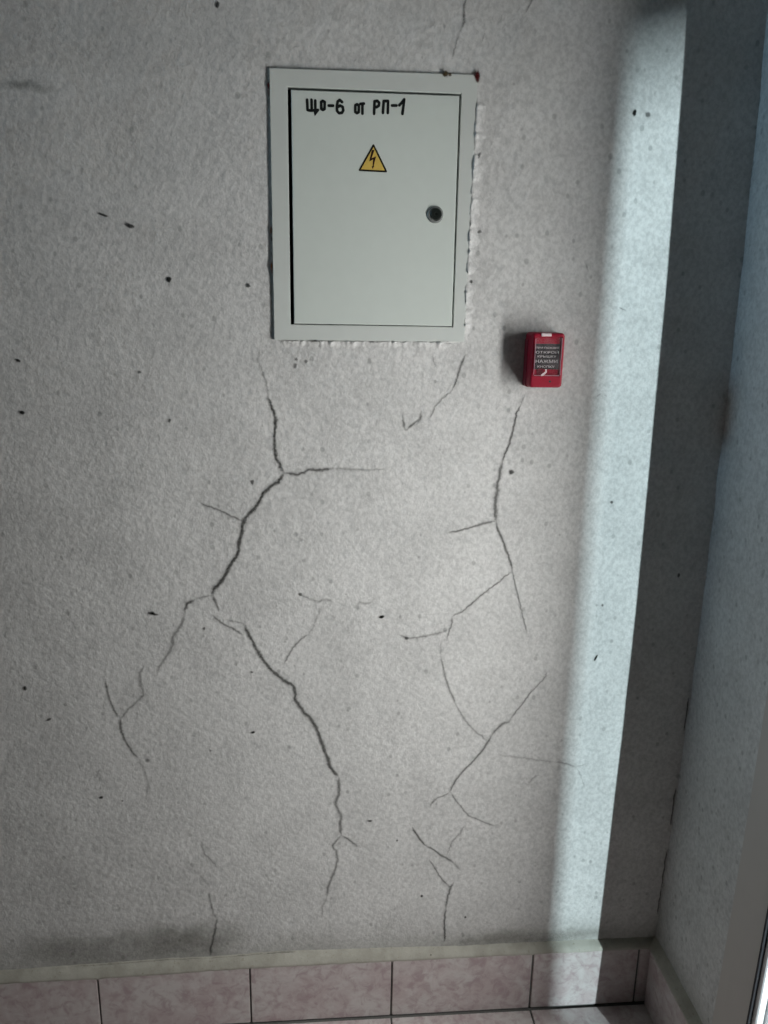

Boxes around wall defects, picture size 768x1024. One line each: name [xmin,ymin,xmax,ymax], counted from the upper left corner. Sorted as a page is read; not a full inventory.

crack [184,399,329,611]
crack [453,407,520,613]
crack [245,628,354,844]